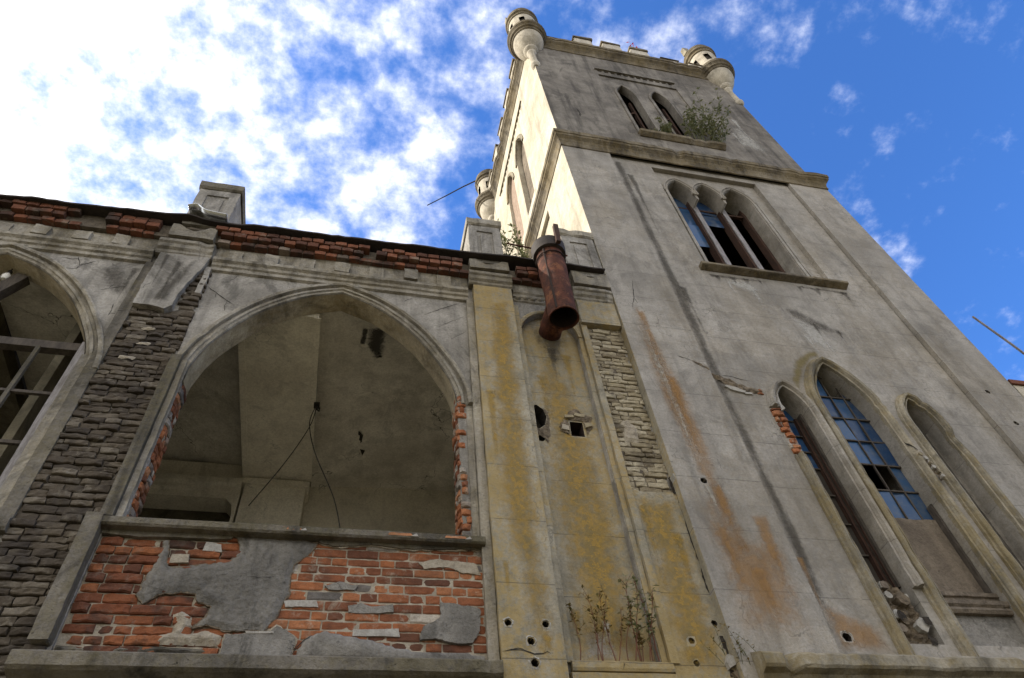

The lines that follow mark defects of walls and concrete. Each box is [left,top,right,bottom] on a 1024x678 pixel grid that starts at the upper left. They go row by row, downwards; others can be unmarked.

spalling [534,405,593,442]
spalling [588,328,676,494]
spalling [680,356,801,454]
spalling [0,271,487,676]
spalling [877,581,939,645]